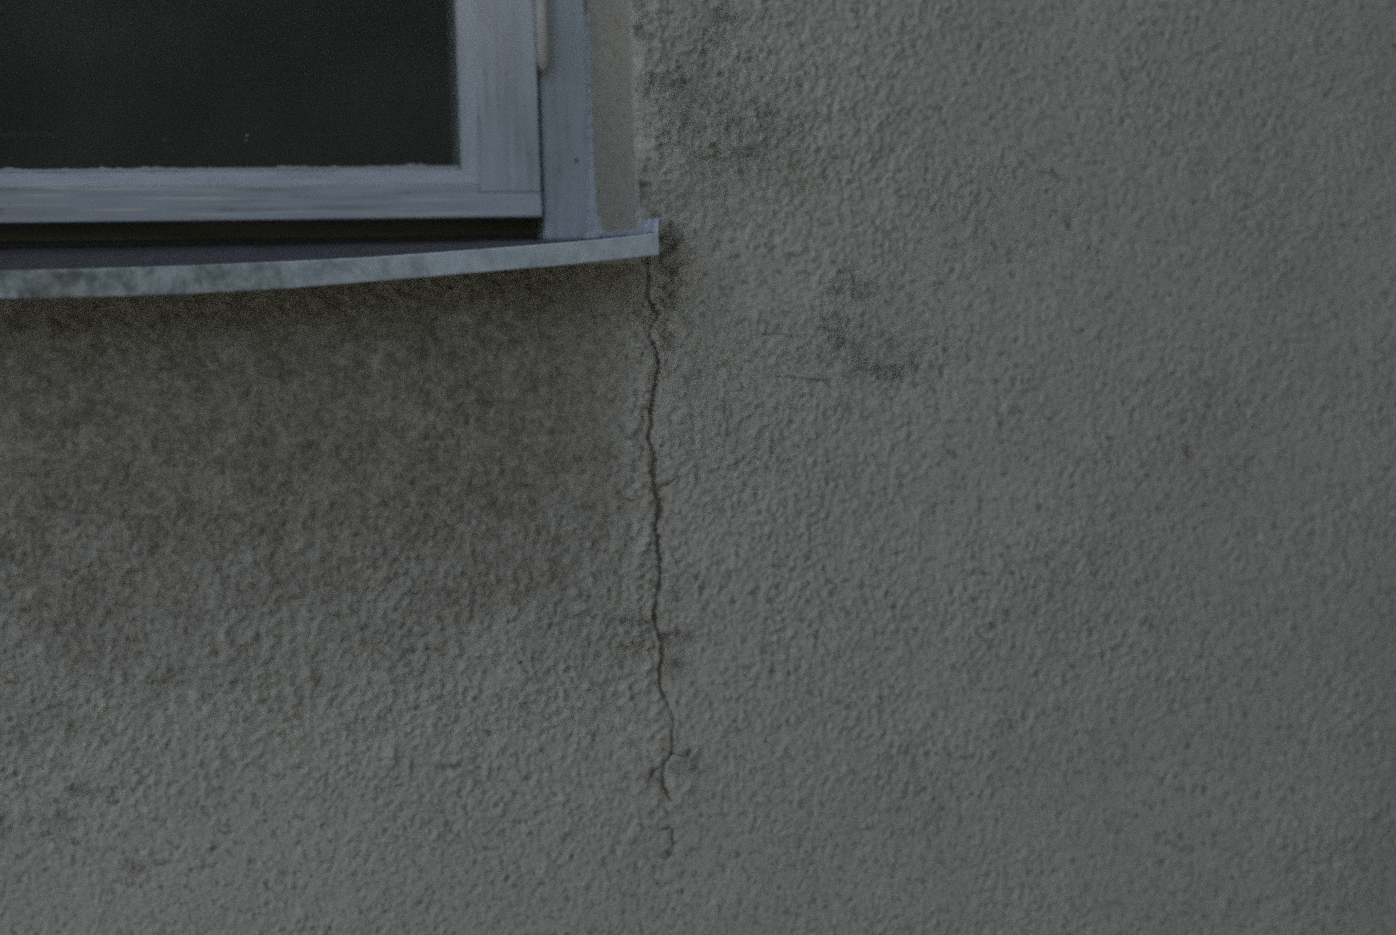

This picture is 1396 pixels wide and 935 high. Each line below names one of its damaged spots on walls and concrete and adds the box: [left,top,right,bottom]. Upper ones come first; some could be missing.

crack [617,256,689,859]